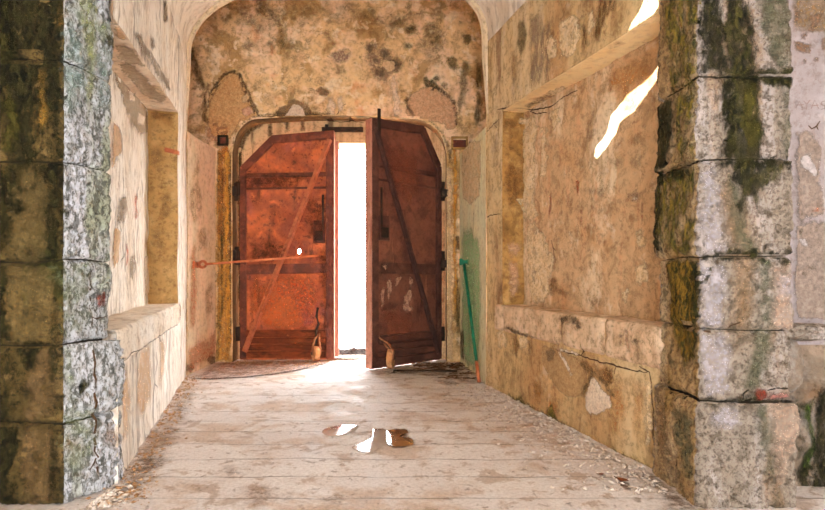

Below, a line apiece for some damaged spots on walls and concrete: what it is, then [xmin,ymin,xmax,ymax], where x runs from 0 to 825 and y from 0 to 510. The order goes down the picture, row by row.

water stain [424,76,445,90]
water stain [448,57,481,122]
crack [485,90,577,134]
water stain [702,267,724,325]
crack [90,350,99,479]
peeling [543,347,614,415]
crack [559,345,688,441]